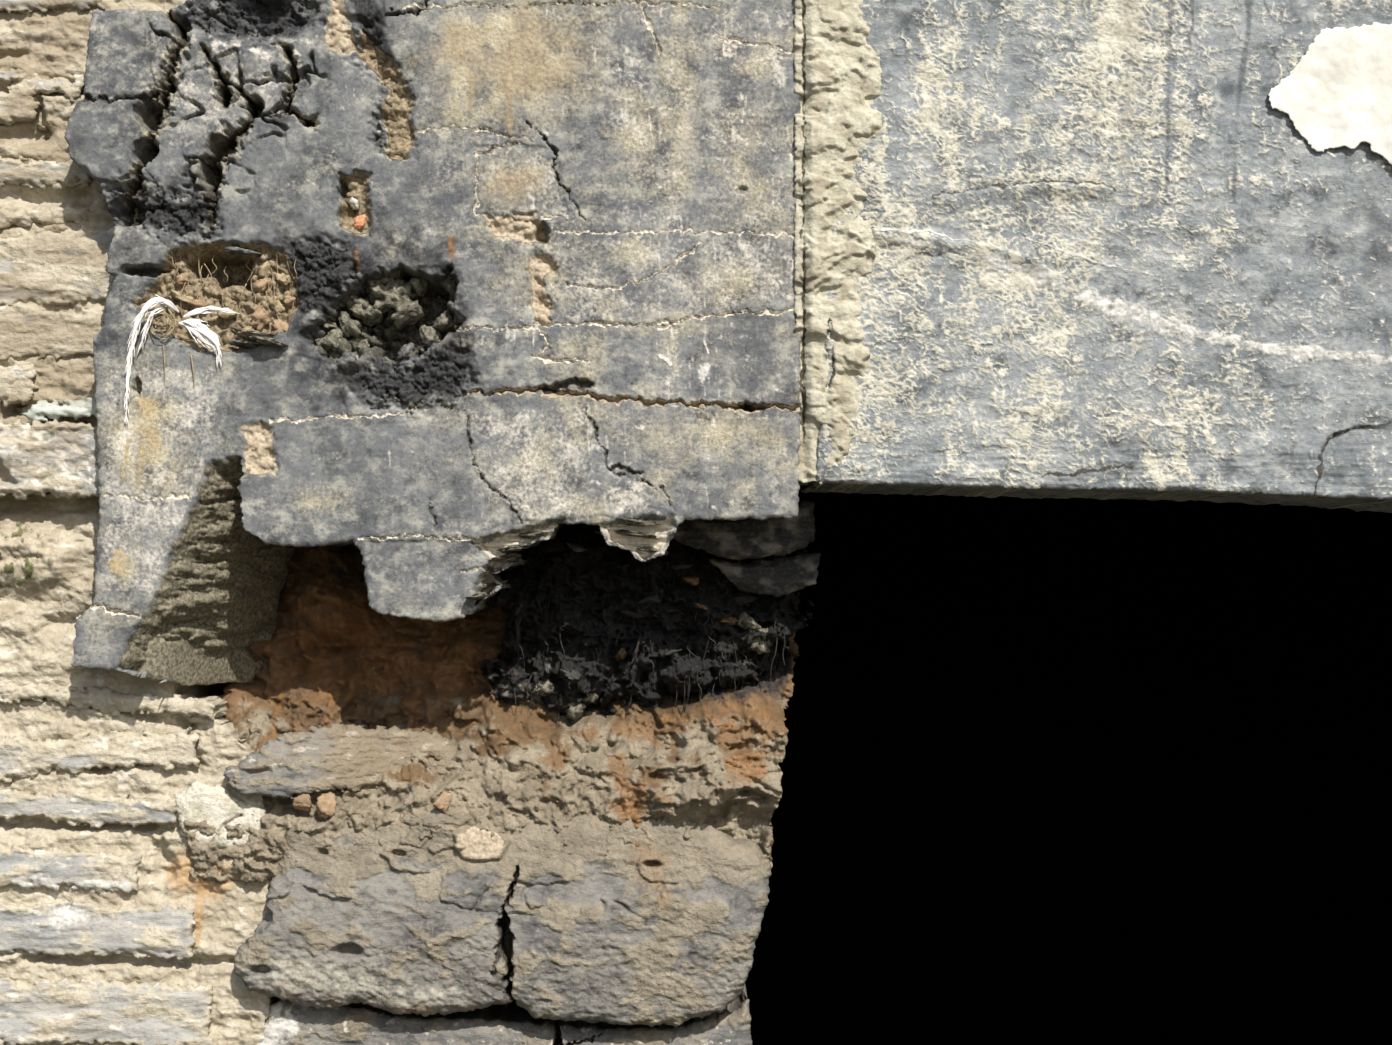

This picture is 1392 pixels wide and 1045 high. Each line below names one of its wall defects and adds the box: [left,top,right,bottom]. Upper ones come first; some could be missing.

crack [83,14,315,226]
peeling [1268,22,1392,165]
spalling [132,241,299,352]
spalling [306,268,462,373]
crack [390,0,836,523]
crack [269,403,426,424]
spalling [465,525,558,602]
spalling [605,517,674,561]
crack [491,867,519,1003]
crack [548,1018,602,1045]